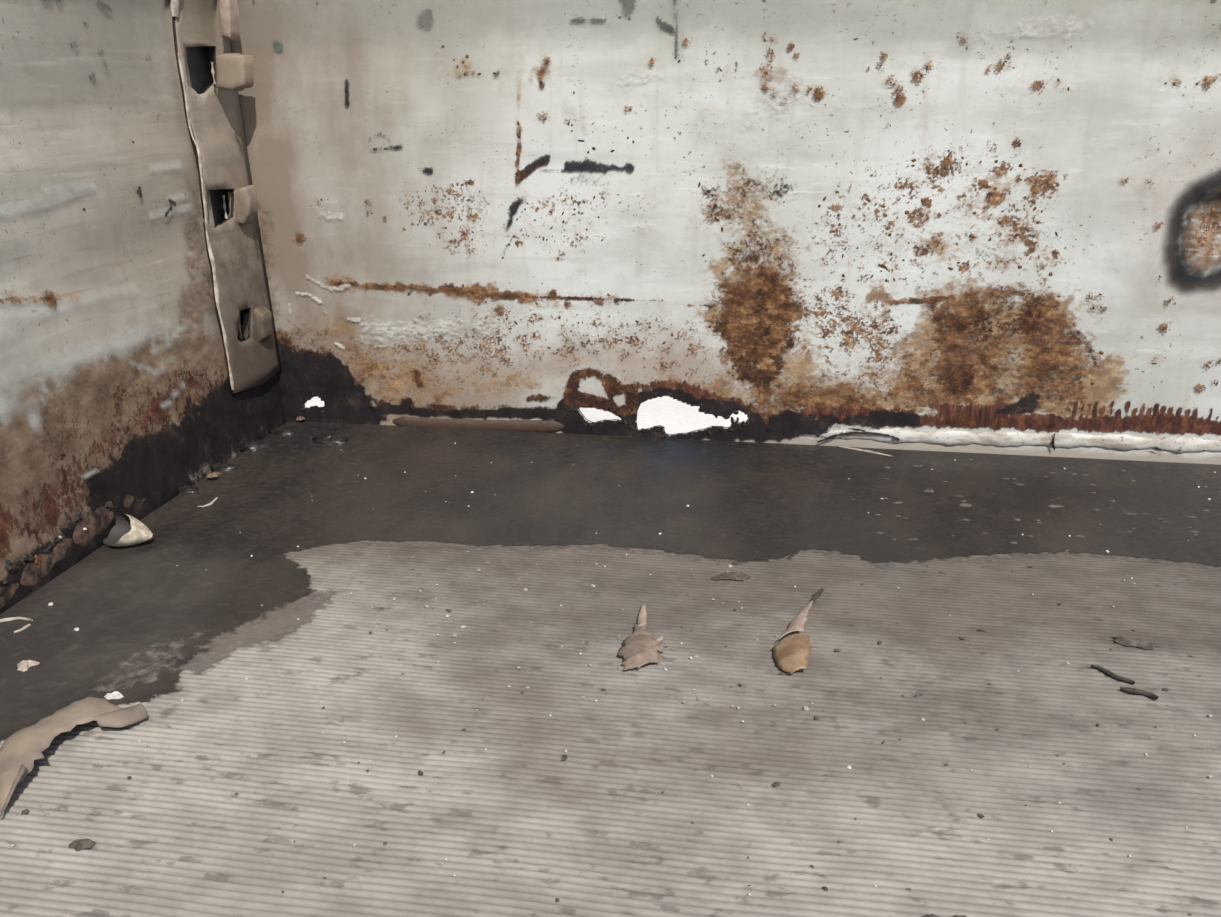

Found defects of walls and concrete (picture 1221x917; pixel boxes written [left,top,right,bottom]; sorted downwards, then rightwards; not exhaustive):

rust [0,289,77,310]
rust [281,137,1221,441]
peeling [571,392,753,438]
rust [0,495,140,609]
damp [0,421,1221,741]
peeling [17,660,40,672]
peeling [104,691,124,700]